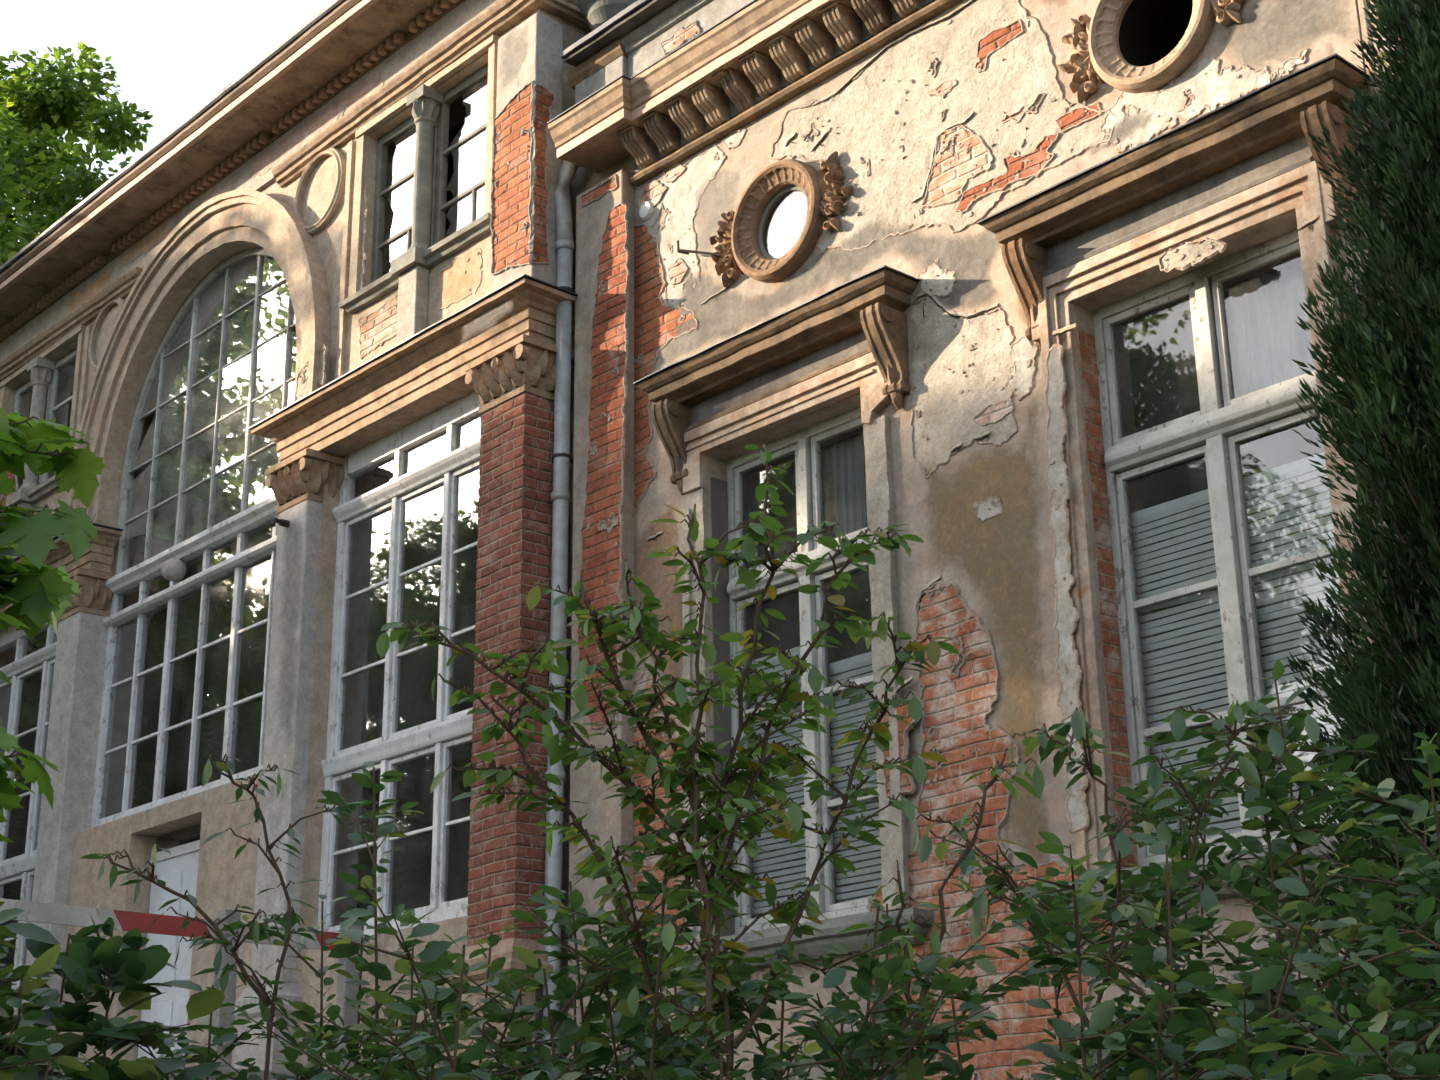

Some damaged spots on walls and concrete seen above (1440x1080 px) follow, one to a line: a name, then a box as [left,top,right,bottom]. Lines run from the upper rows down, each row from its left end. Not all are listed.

flaking render [438,80,556,310]
flaking render [771,0,1309,255]
flaking render [576,128,747,971]
leakage [929,448,1045,862]
flaking render [865,581,1117,1080]
flaking render [909,258,1090,834]